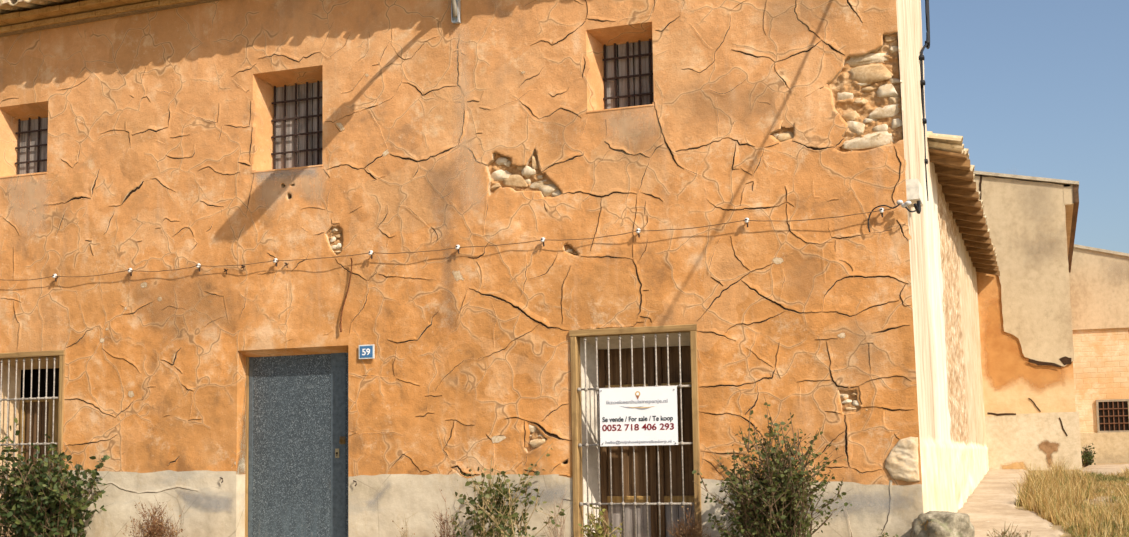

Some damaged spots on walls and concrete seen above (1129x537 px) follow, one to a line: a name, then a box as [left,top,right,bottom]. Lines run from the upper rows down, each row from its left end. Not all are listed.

spalling [828,34,904,152]
spalling [489,151,562,197]
crack [1,149,177,350]
spalling [327,226,342,255]
crack [40,0,914,536]
peeling [985,300,1072,389]